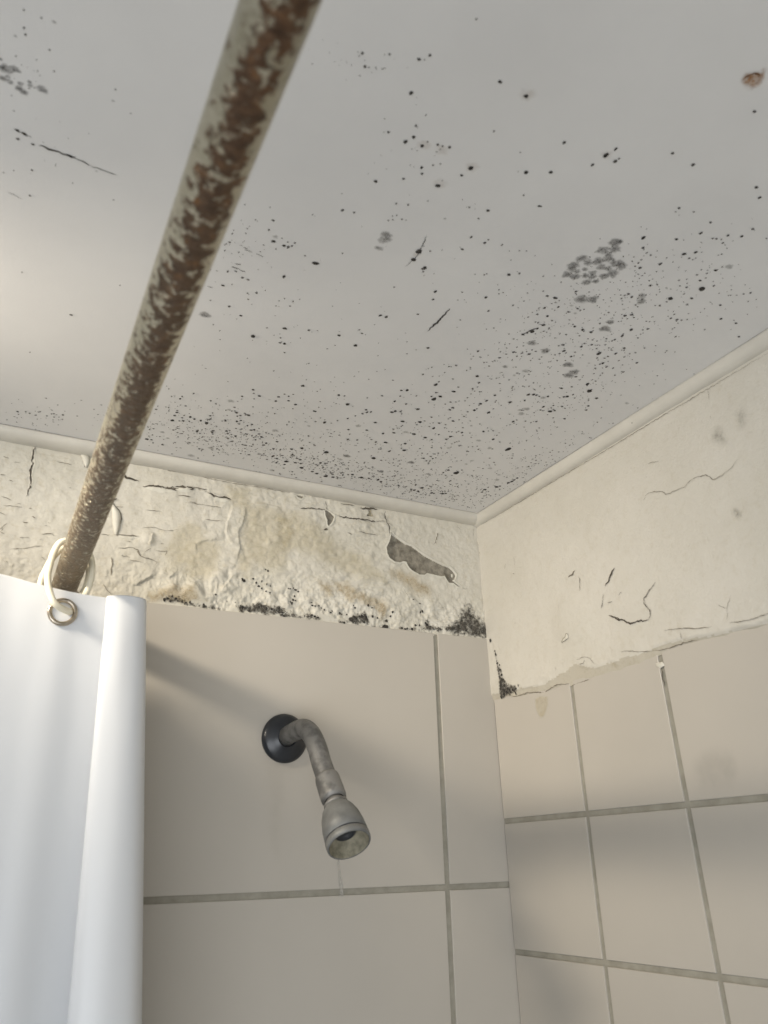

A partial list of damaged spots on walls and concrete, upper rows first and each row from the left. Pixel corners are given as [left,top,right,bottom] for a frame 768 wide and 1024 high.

leakage [14,129,116,175]
leakage [208,207,296,301]
leakage [145,222,757,508]
crack [0,447,71,562]
crack [101,470,289,594]
spalling [294,493,464,589]
crack [644,461,736,499]
leakage [163,569,516,699]
crack [514,657,593,697]
crack [568,569,767,652]